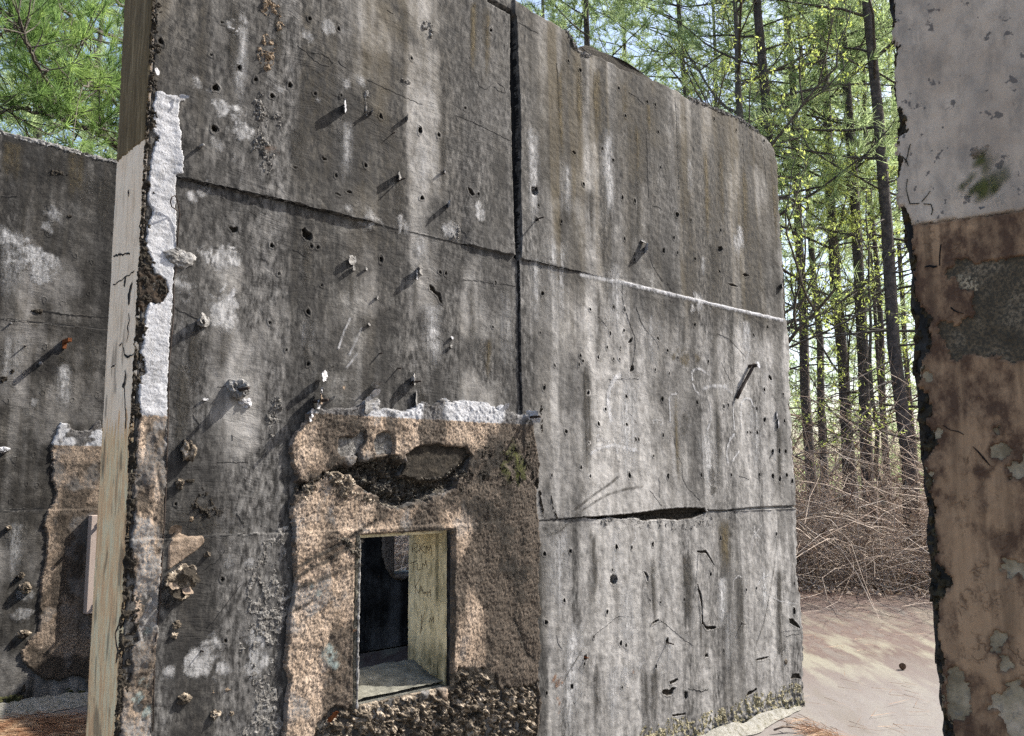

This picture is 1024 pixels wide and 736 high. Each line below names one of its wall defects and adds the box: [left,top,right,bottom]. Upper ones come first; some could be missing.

spalling [894,81,909,178]
spalling [114,0,169,736]
spalling [293,405,558,519]
peeling [901,206,1024,736]
spalling [337,537,361,559]
spalling [0,684,26,703]
spalling [314,668,538,736]